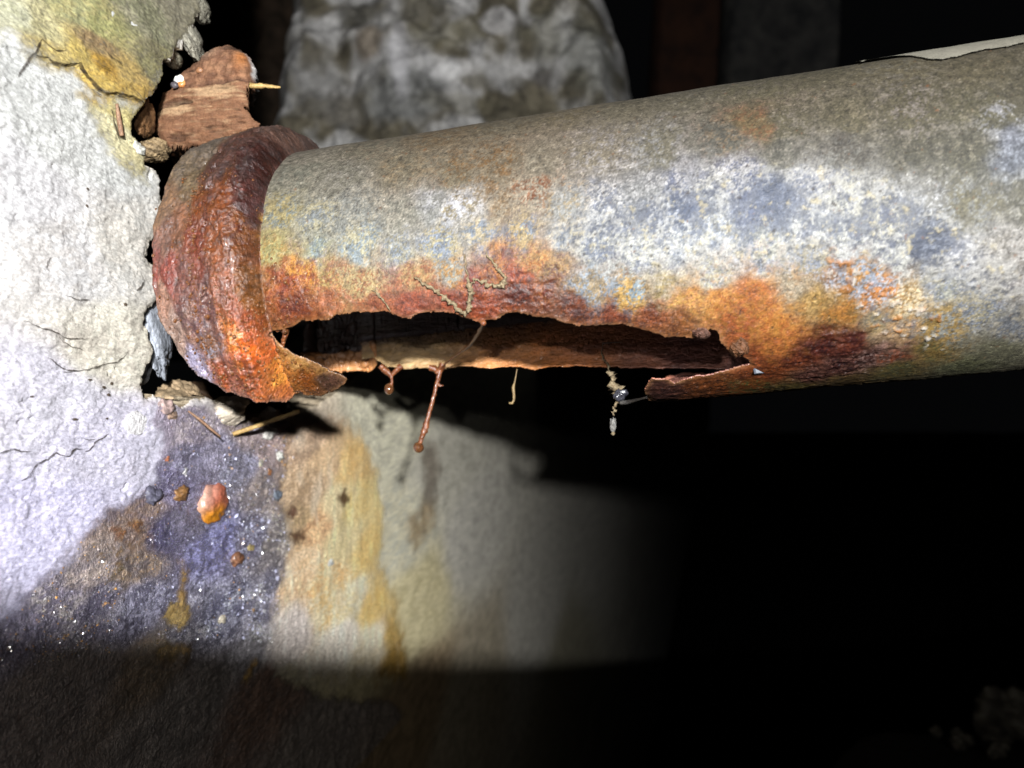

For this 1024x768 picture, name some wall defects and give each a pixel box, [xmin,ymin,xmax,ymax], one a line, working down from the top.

crack [18,38,144,141]
damp [0,0,200,175]
rust [275,327,292,347]
rust [378,363,404,395]
damp [0,406,406,768]